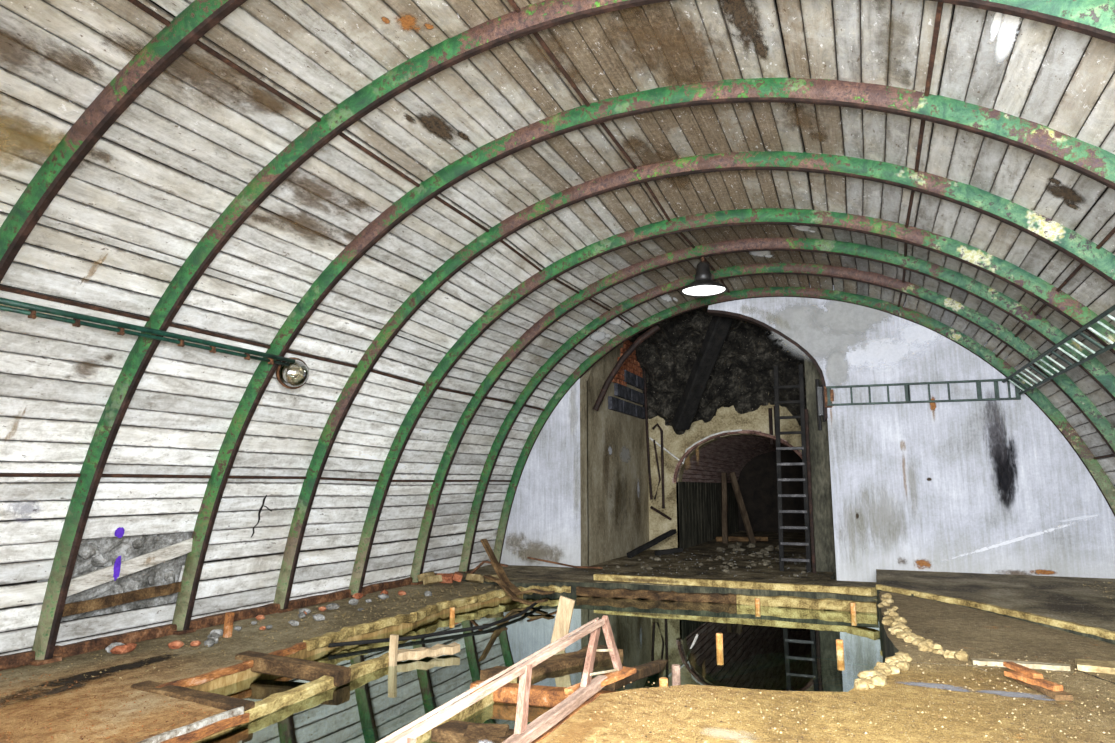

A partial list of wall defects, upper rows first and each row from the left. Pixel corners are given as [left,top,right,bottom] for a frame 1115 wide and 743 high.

rust [381,14,434,32]
damp [719,0,768,59]
damp [405,113,469,141]
damp [1046,178,1084,209]
damp [988,400,1014,506]
crack [251,495,272,537]